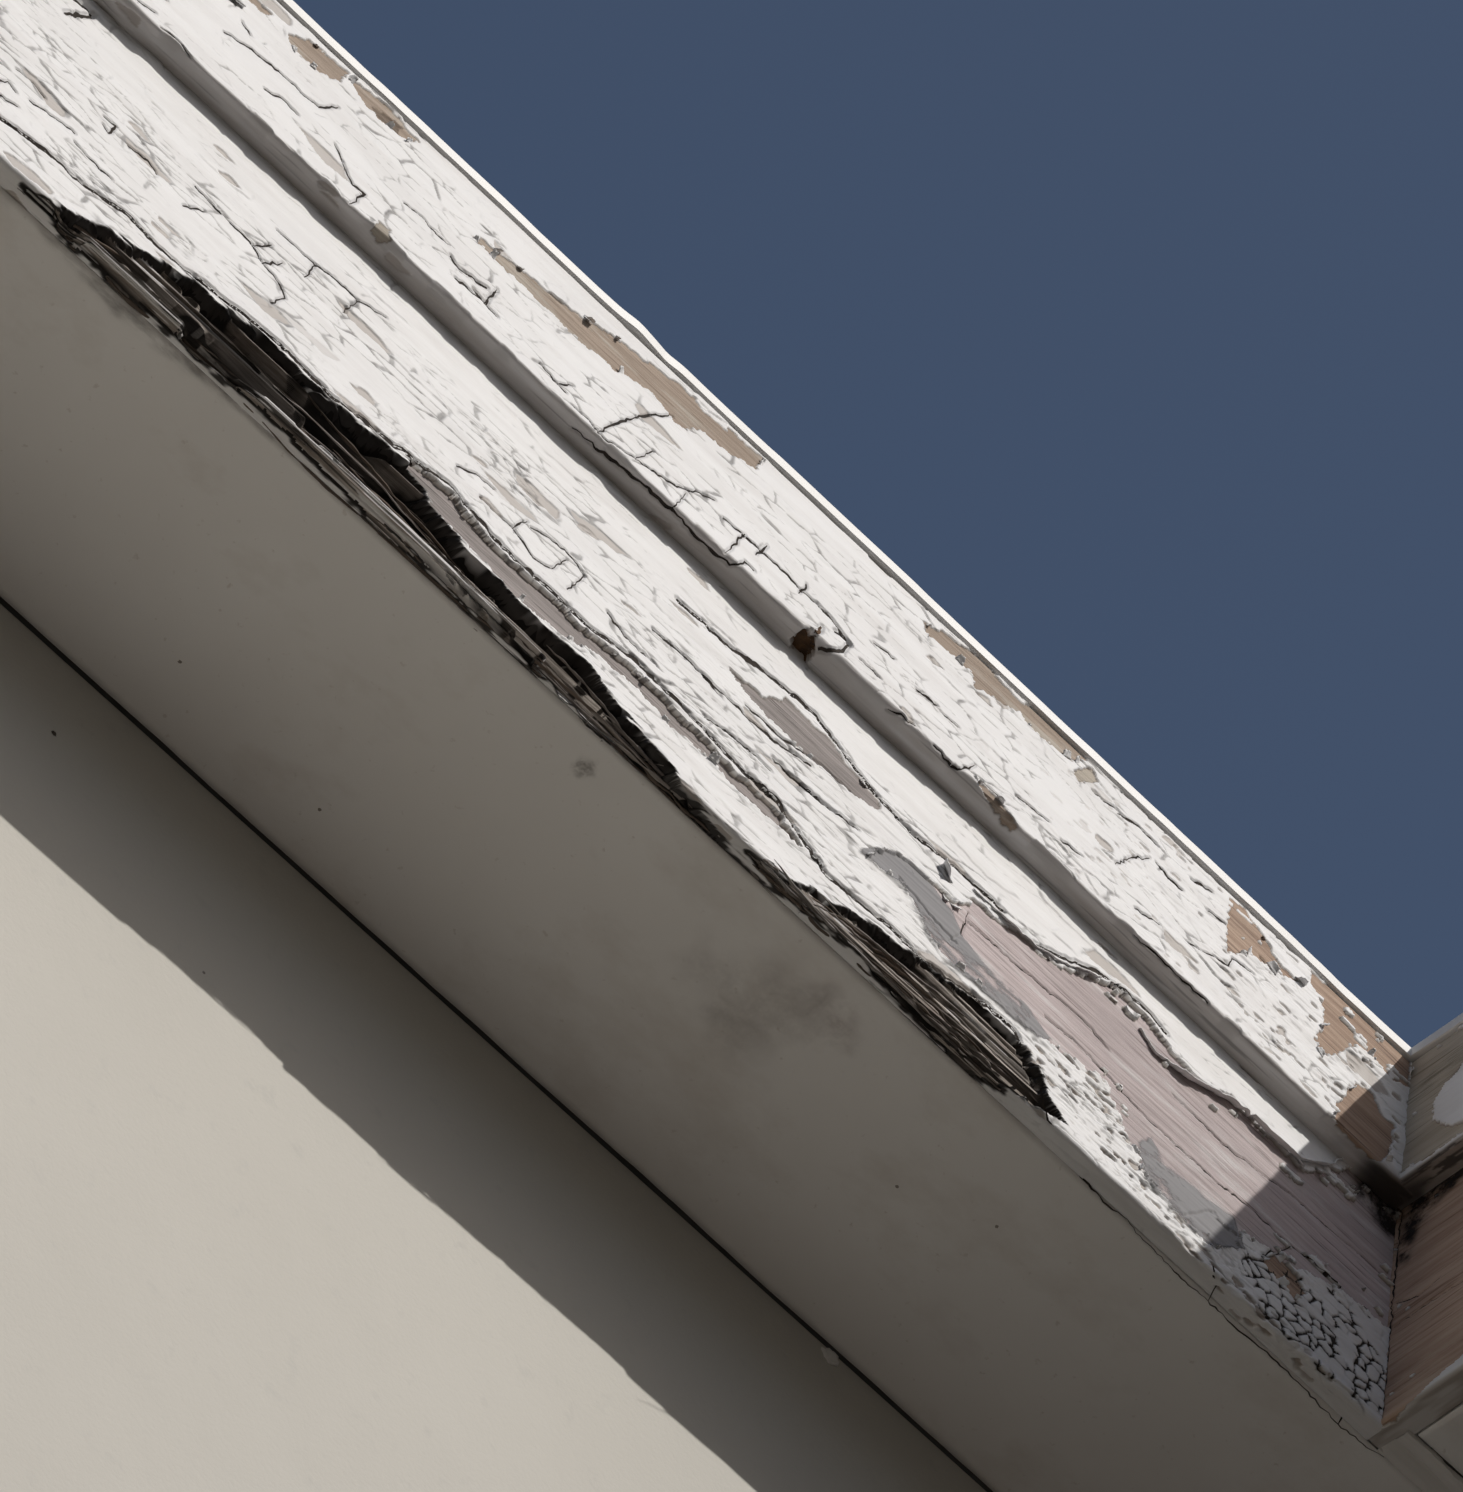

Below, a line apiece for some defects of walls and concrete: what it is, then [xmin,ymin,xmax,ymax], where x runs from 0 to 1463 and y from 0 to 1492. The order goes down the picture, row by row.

crack [64,0,92,19]
crack [224,23,338,115]
peeling [288,35,419,143]
peeling [474,235,766,469]
crack [0,69,1080,1125]
peeling [407,466,792,840]
peeling [734,675,879,809]
peeling [974,774,1017,831]
peeling [924,623,1097,783]
crack [1094,793,1272,1004]
peeling [914,858,1463,1425]
crack [960,913,1462,1457]